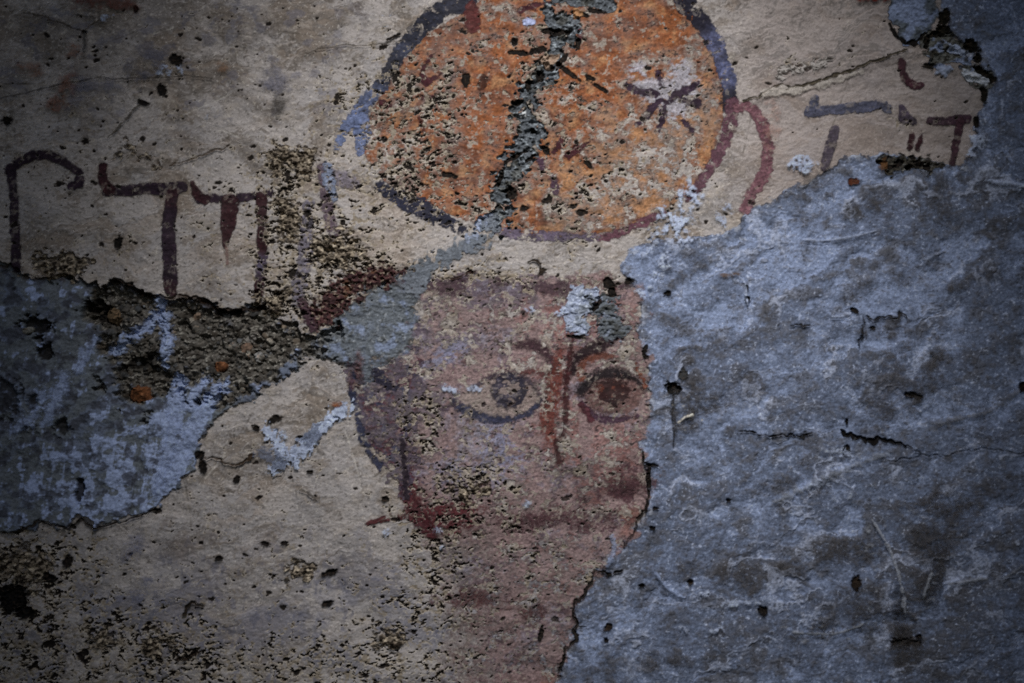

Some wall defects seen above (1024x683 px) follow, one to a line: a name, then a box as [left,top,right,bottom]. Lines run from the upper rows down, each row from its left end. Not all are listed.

crack [743,49,908,102]
spalling [888,0,997,104]
spalling [876,151,946,179]
spalling [0,0,617,619]
peeling [560,277,637,342]
crack [740,430,813,439]
crack [838,419,921,455]